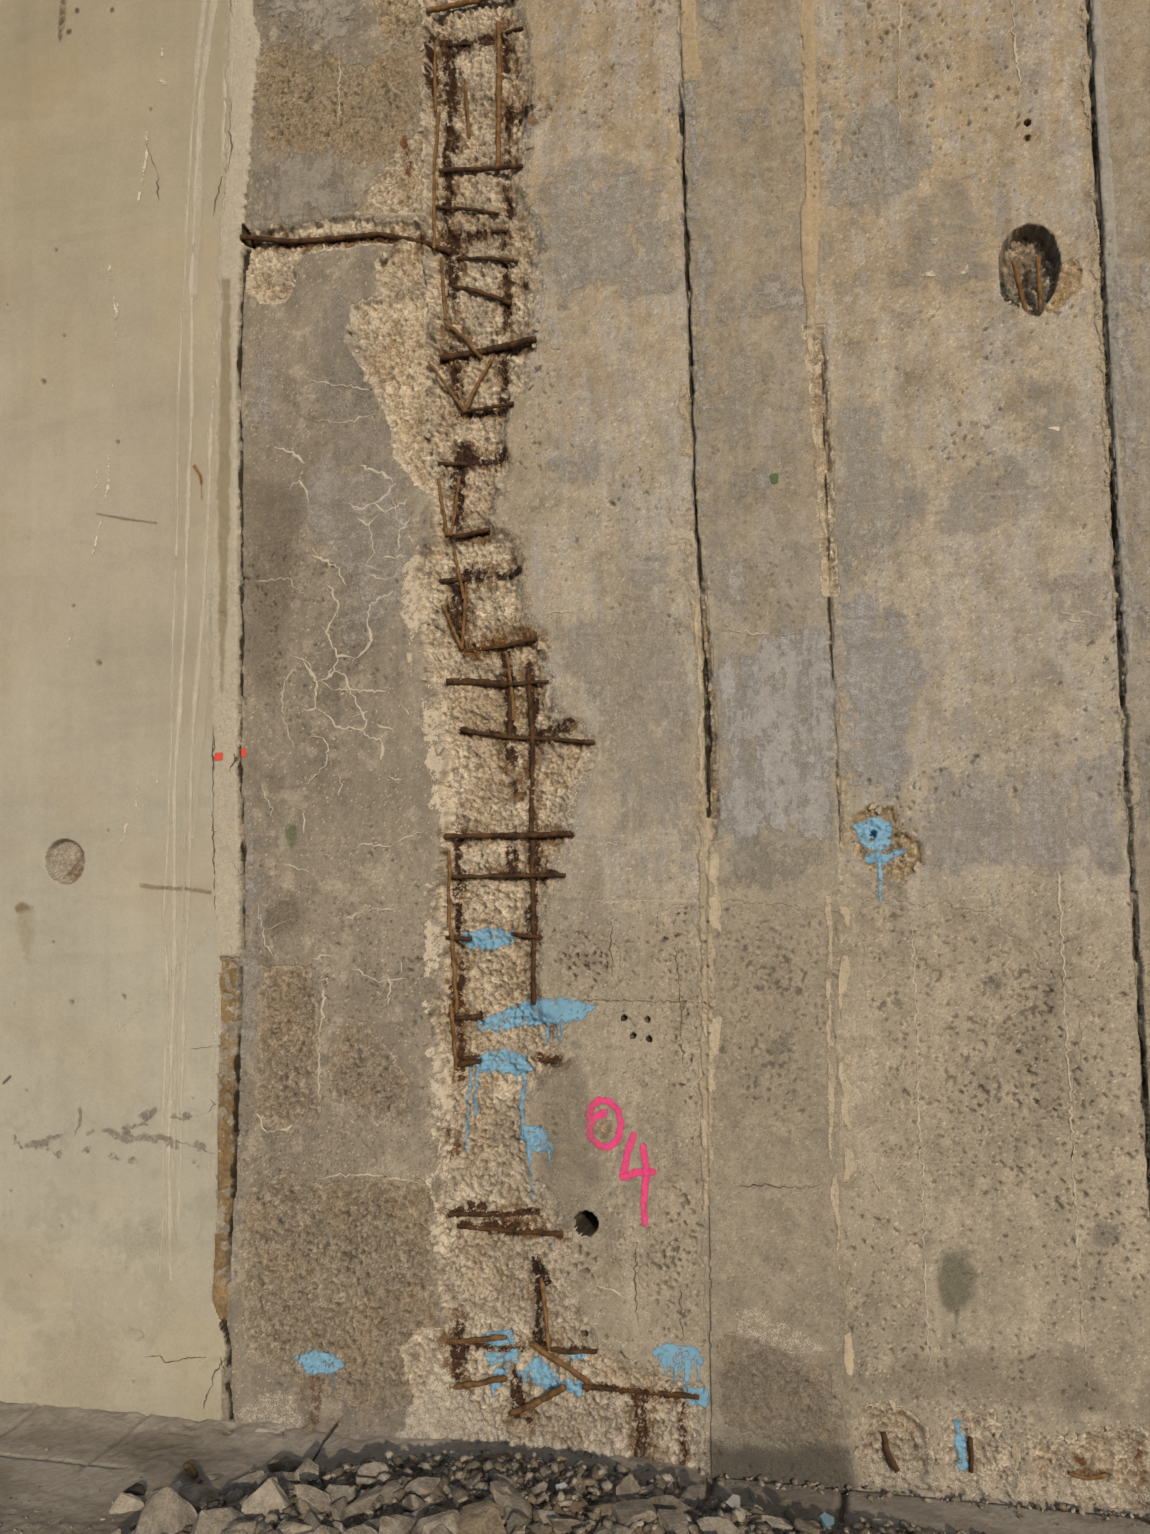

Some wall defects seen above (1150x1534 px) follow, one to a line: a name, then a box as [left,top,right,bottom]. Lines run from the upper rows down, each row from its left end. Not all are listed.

crack [213,98,233,215]
crack [678,105,701,587]
crack [171,905,406,1238]
crack [211,249,410,998]
crack [351,832,422,850]
spalling [234,0,1150,1511]
crack [592,362,841,845]
crack [1089,76,1150,1185]
corrosion [436,1200,591,1433]
corrosion [585,1383,692,1465]